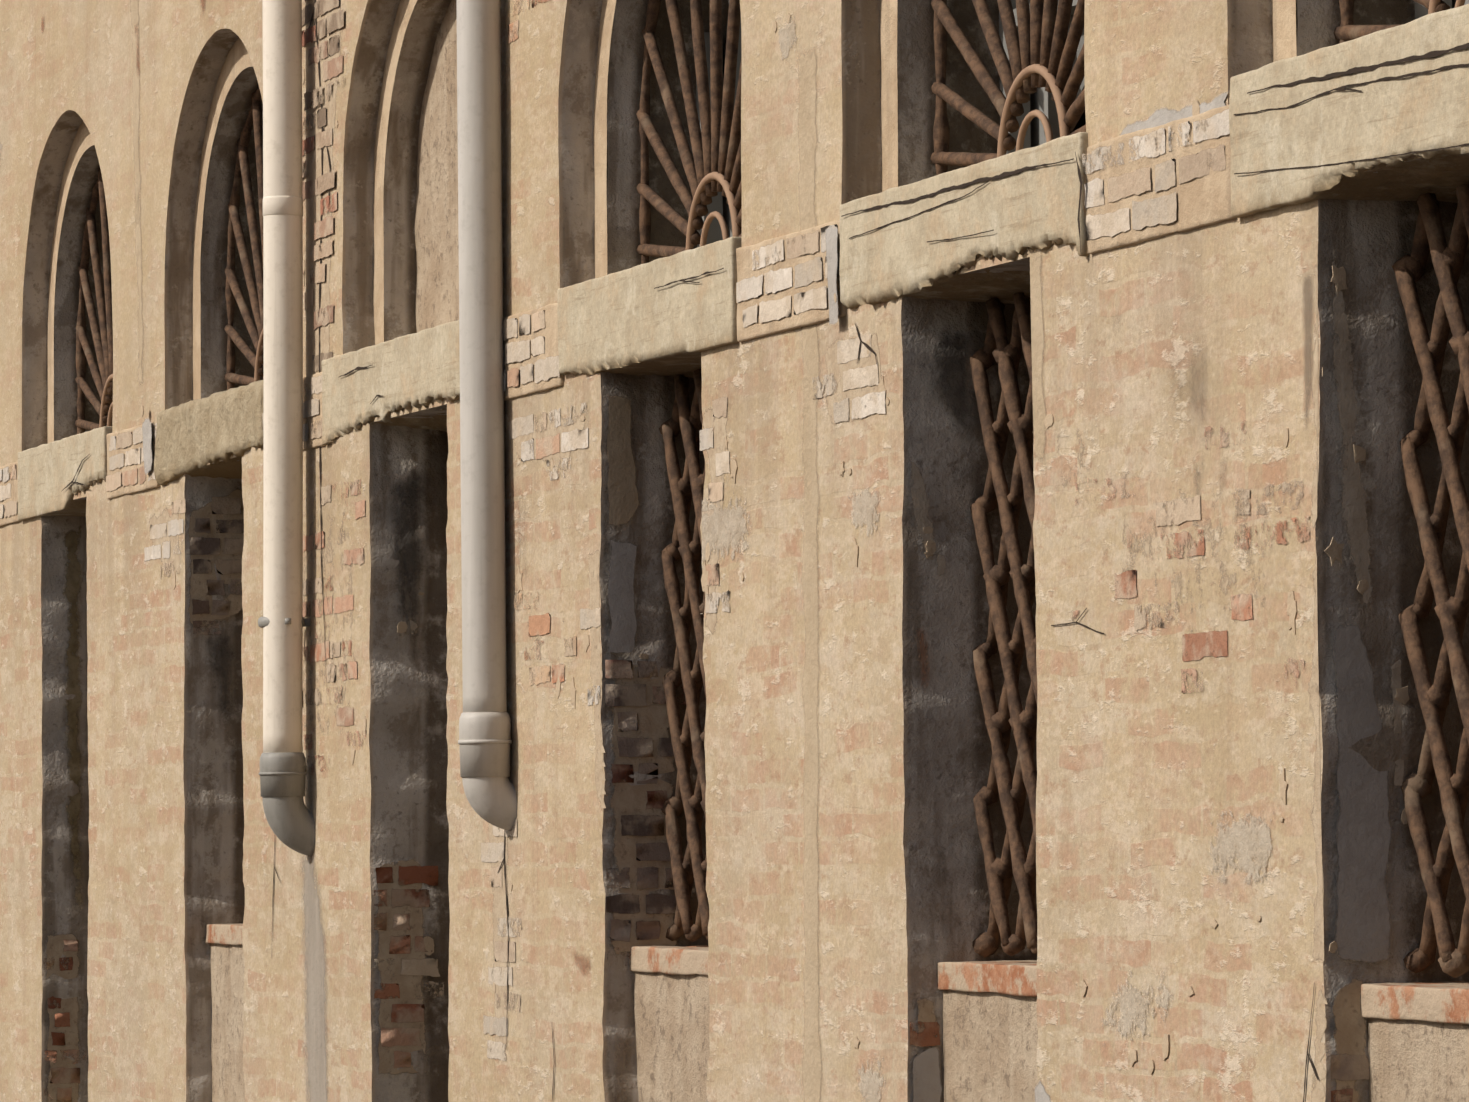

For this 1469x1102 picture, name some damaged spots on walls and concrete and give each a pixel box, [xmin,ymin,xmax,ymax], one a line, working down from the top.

crack [841,153,1082,252]
damp [395,475,424,618]
flaking render [1391,660,1409,734]
spalling [374,859,444,1074]
spalling [1311,979,1370,1102]